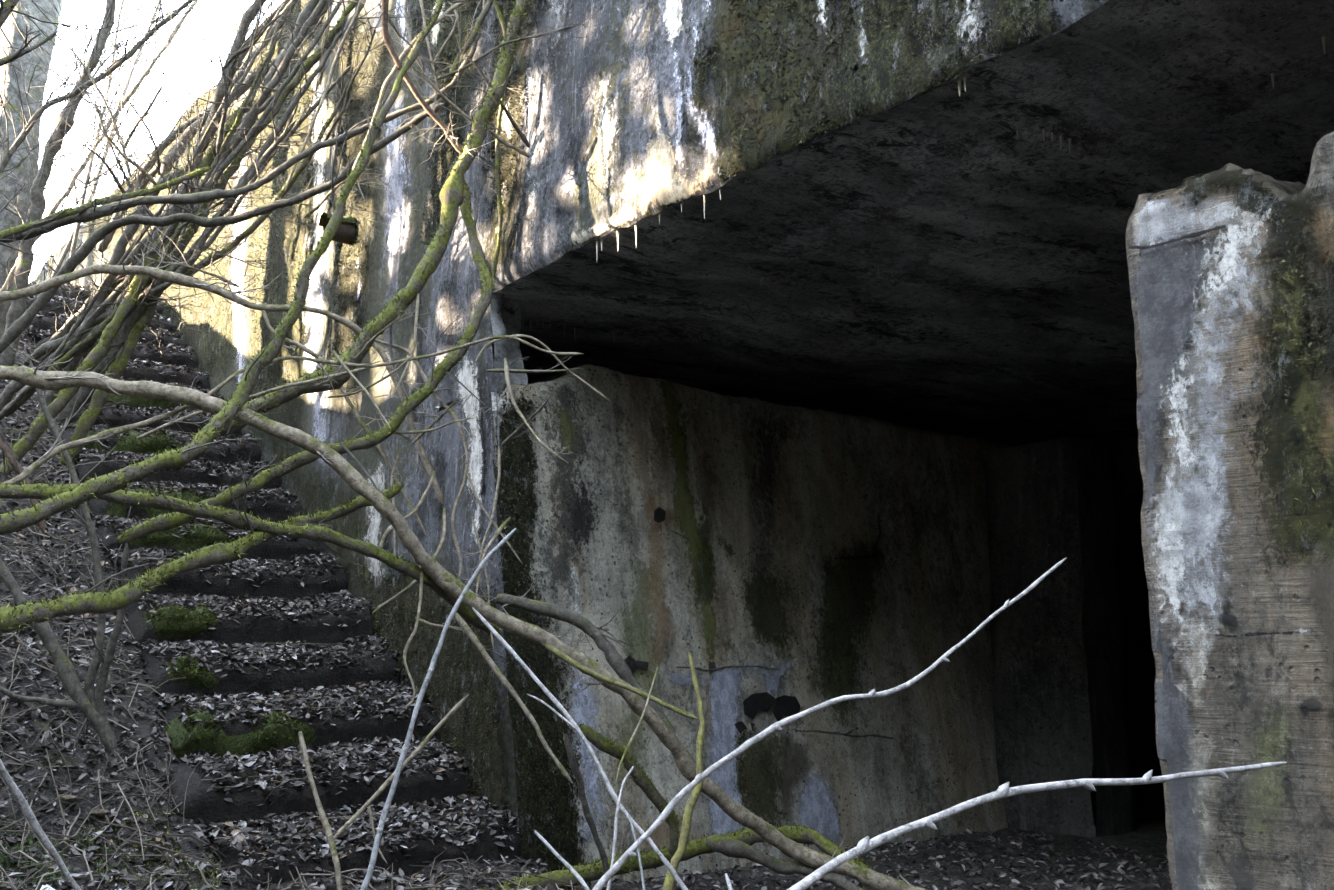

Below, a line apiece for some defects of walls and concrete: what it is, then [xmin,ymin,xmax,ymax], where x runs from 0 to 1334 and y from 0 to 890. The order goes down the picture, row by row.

leakage [231,195,247,381]
leakage [303,33,328,373]
leakage [381,99,411,275]
leakage [502,70,619,225]
leakage [662,0,716,164]
leakage [813,0,827,32]
leakage [957,0,979,42]
leakage [309,392,330,466]
leakage [534,376,606,614]
leakage [1132,199,1271,890]